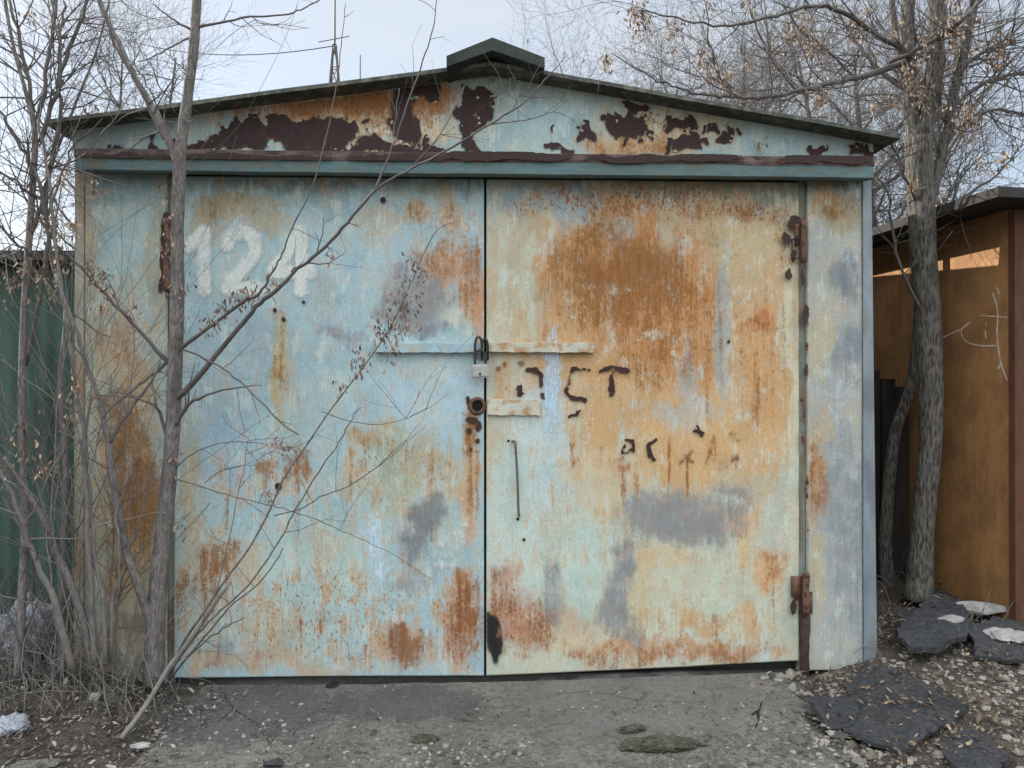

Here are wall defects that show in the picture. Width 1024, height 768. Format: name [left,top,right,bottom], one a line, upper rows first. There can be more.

peeling [79,134,171,158]
peeling [173,84,742,163]
peeling [773,142,874,164]
corrosion [412,209,482,335]
corrosion [548,201,727,388]
corrosion [94,386,161,601]
corrosion [255,450,312,513]
corrosion [462,412,479,528]
corrosion [176,499,241,622]
corrosion [384,622,432,670]
corrosion [444,568,552,672]
corrosion [565,615,747,669]